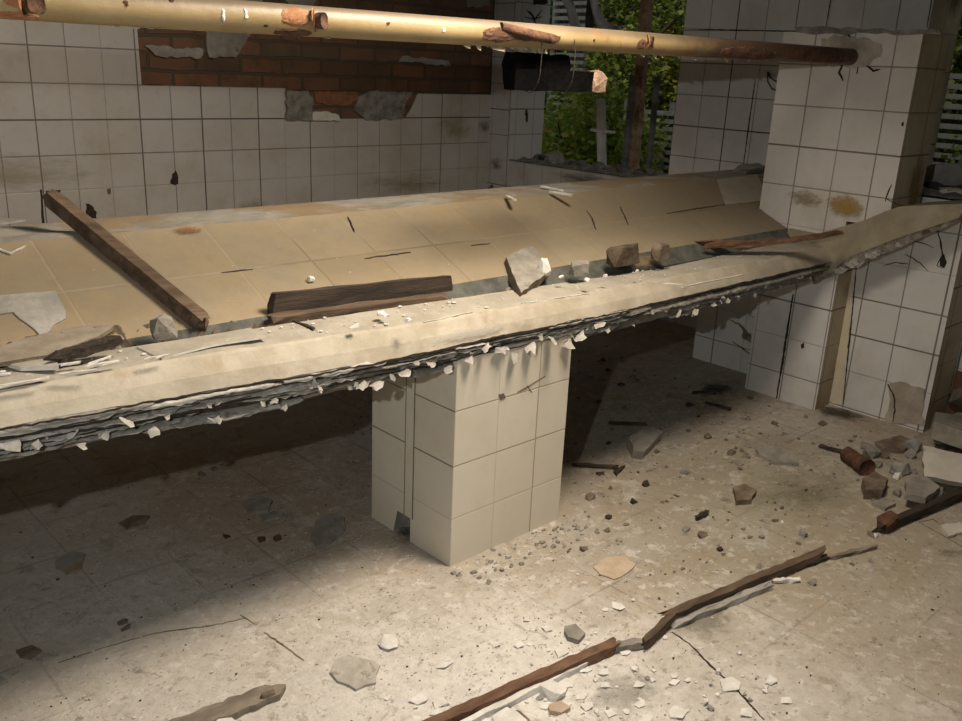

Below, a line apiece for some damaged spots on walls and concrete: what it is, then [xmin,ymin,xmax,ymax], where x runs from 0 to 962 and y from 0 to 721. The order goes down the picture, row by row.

corrosion [0,0,41,20]
corrosion [273,7,315,36]
flaking render [244,0,493,32]
flaking render [137,9,547,121]
spalling [794,26,941,81]
damp [795,194,863,216]
peeling [114,531,647,713]
crack [672,632,765,720]